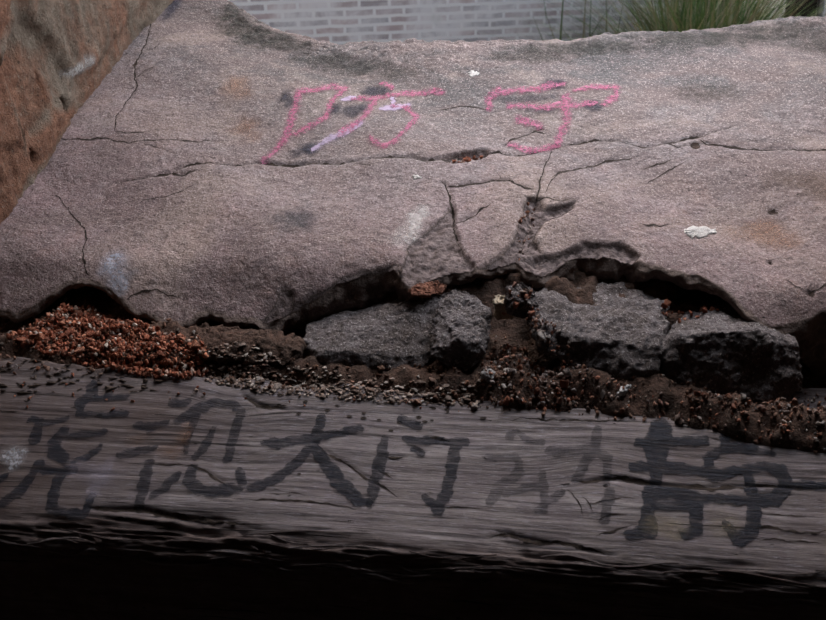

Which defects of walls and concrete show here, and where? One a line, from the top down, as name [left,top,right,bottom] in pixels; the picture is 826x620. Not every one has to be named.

crack [61,24,225,149]
crack [24,187,89,276]
crack [116,162,241,206]
crack [261,156,460,168]
crack [441,126,826,248]